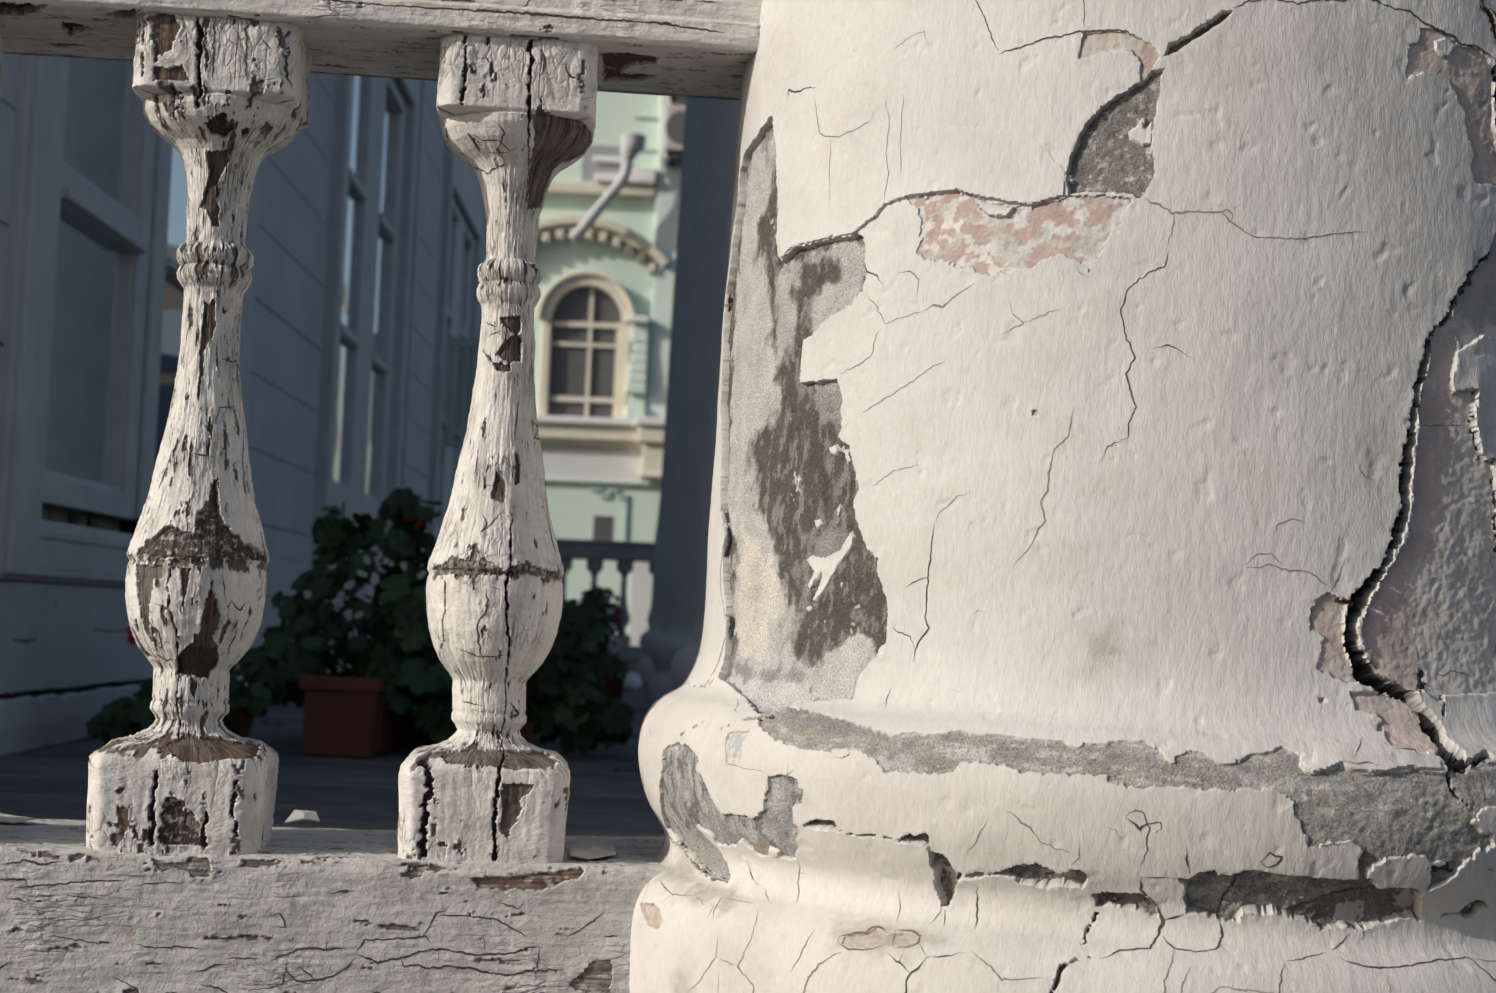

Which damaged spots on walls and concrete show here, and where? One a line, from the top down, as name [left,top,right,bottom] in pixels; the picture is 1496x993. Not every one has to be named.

peeling [527,111,592,209]
peeling [909,15,1229,276]
peeling [133,481,266,657]
spalling [726,127,1496,926]
crack [1246,252,1496,806]
crack [148,770,159,845]
crack [197,780,239,847]
crack [417,753,434,857]
peeling [441,749,555,837]
spalling [663,744,803,881]
crack [137,903,617,993]
crack [642,810,1496,993]